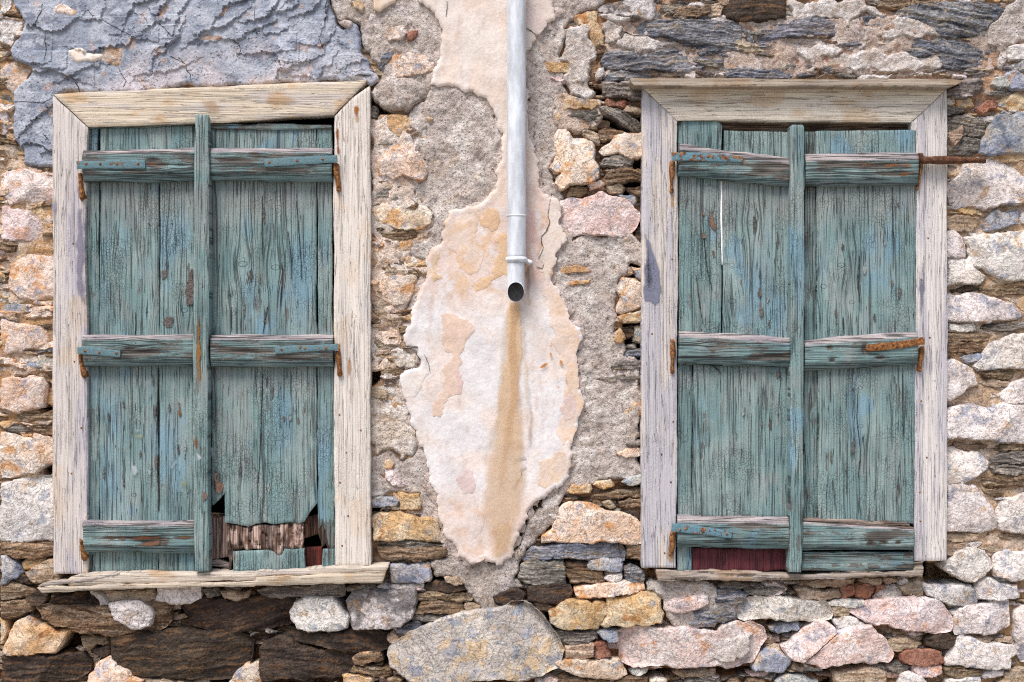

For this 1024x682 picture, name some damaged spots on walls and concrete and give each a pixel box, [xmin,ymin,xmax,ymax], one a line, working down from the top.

flaking render [54,4,76,16]
flaking render [101,47,123,66]
crack [88,10,191,80]
rust [885,153,986,176]
peeling [331,0,641,609]
water stain [489,303,523,510]